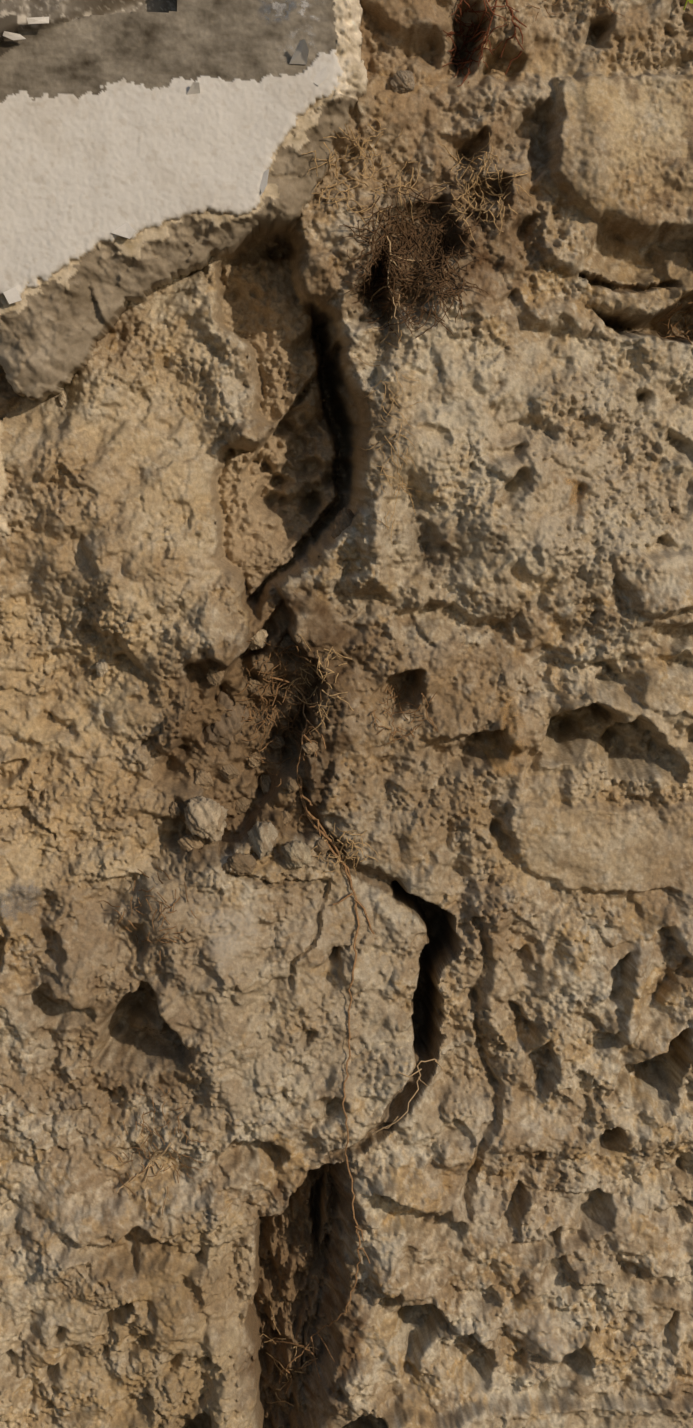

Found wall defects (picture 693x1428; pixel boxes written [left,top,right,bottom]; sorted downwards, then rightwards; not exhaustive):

spalling [0,0,368,402]
crack [180,225,505,1428]